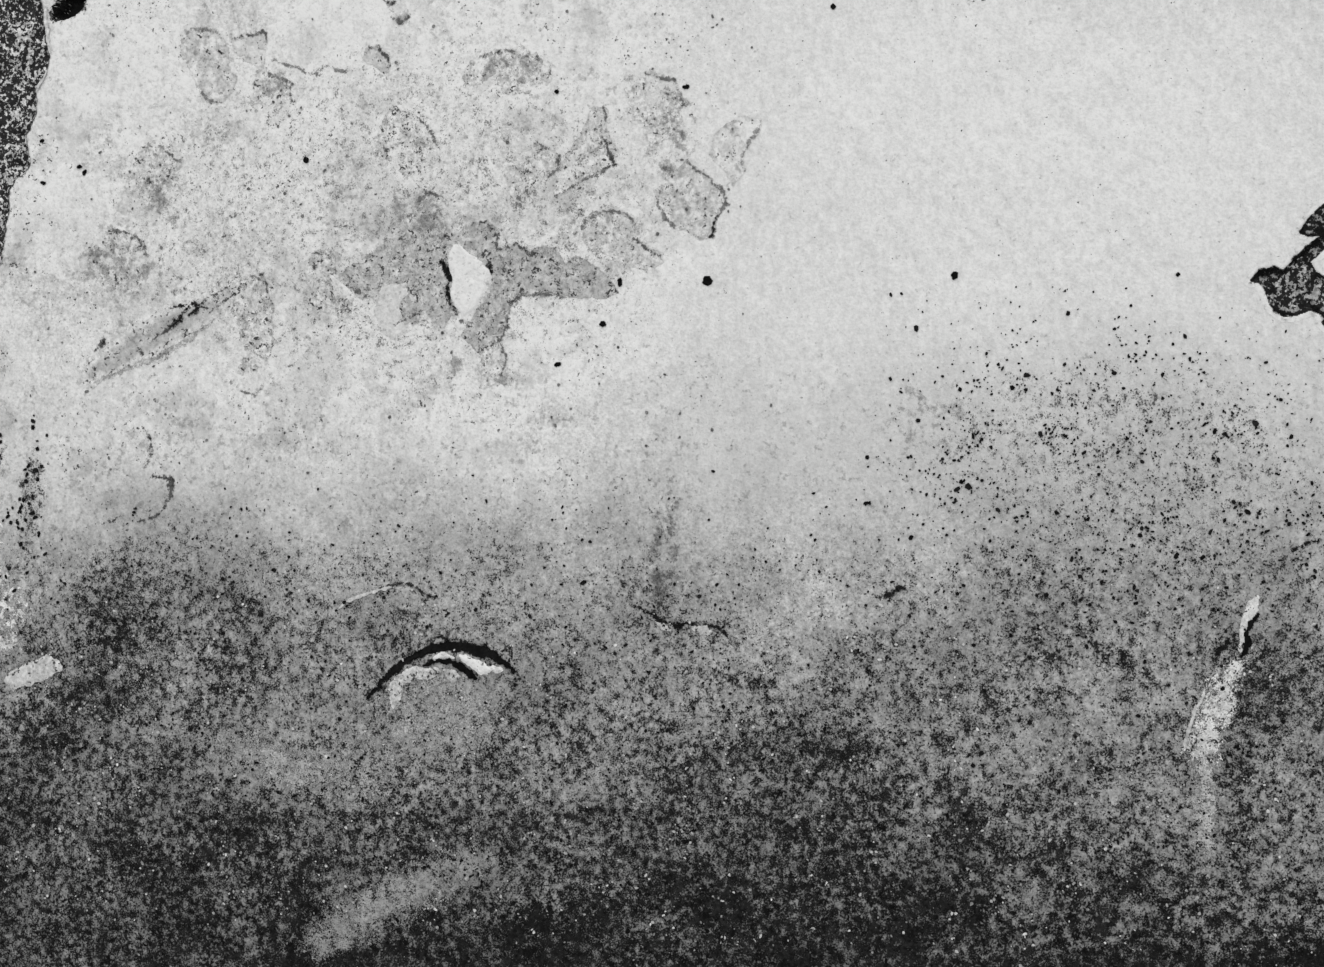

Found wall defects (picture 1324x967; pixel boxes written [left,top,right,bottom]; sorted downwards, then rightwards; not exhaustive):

flaking render [384,0,410,25]
spalling [0,0,51,265]
spalling [1243,198,1324,332]
crack [337,582,532,709]
damp [0,286,1324,967]